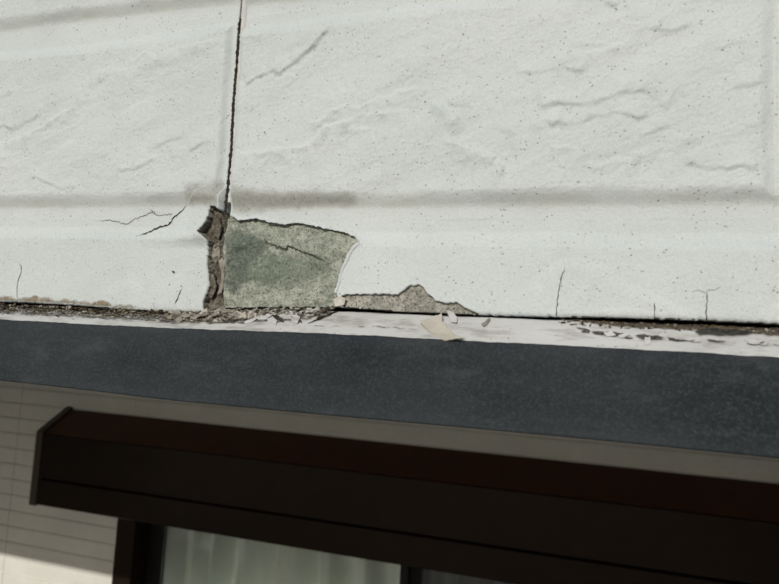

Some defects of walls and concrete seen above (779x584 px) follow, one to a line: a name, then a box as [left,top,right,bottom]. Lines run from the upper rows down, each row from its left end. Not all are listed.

crack [224,0,242,215]
crack [99,206,186,234]
peeling [206,208,477,322]
peeling [578,327,726,345]